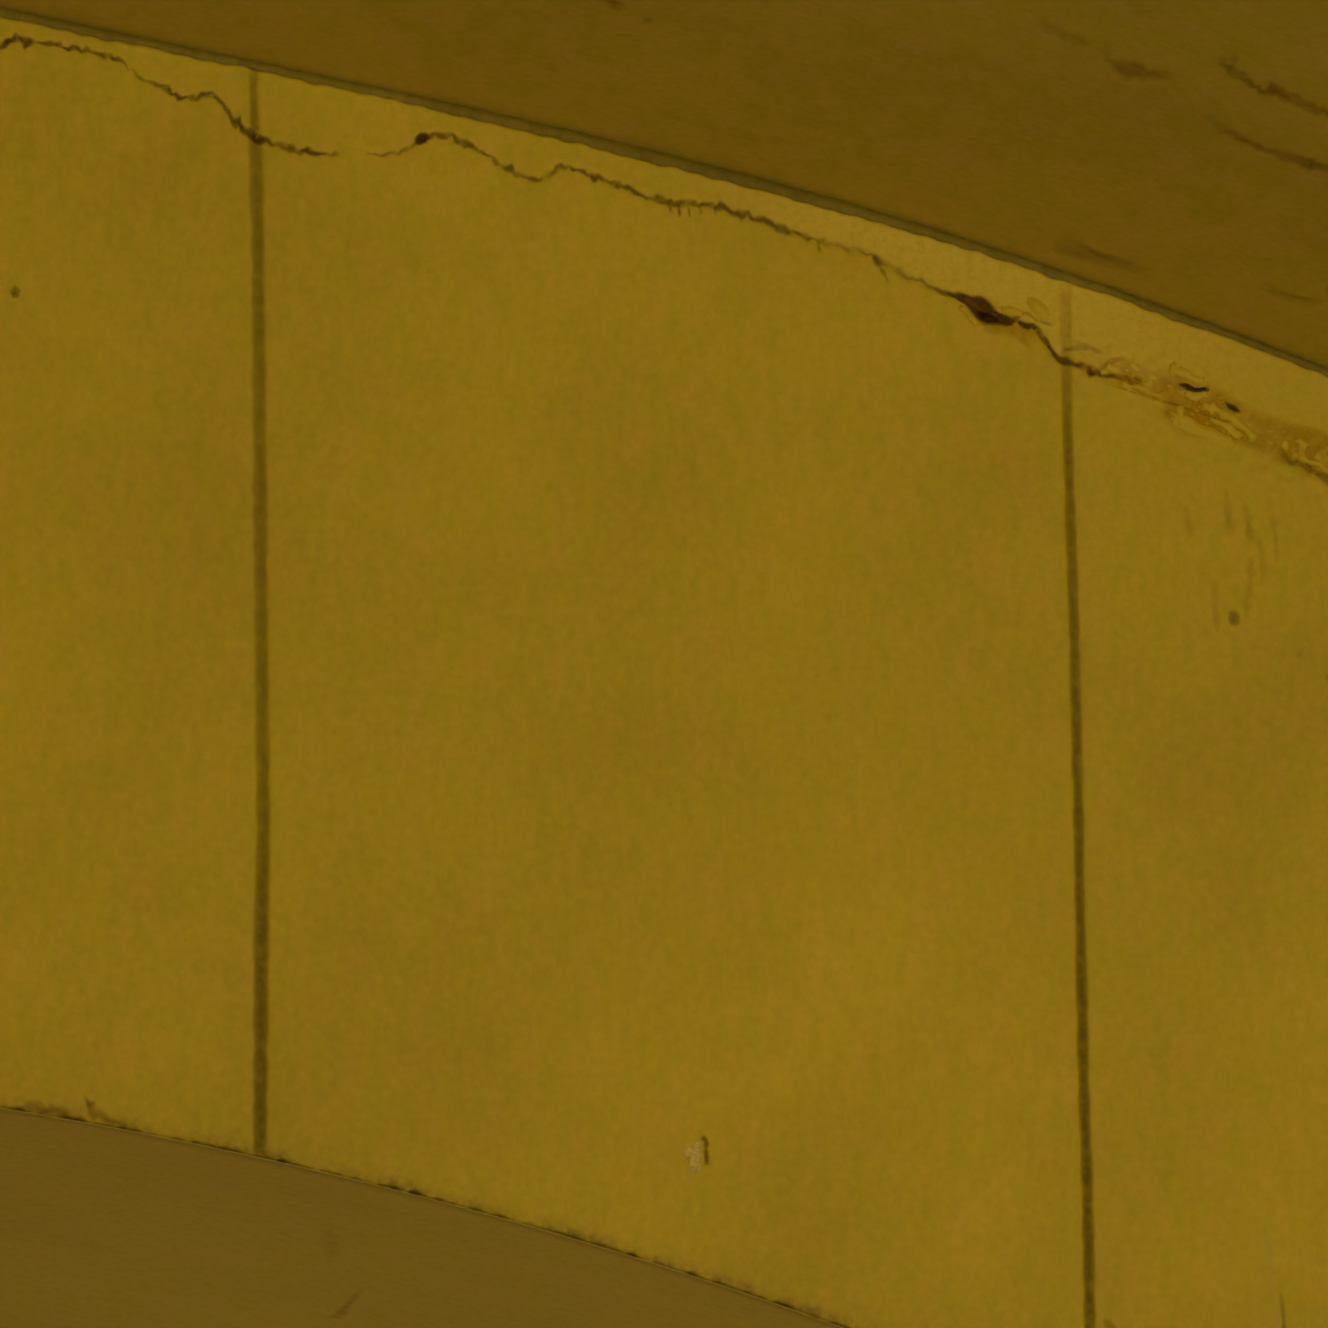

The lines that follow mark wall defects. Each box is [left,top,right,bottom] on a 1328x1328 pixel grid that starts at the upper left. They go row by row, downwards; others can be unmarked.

crack [0,34,119,60]
crack [157,85,324,156]
crack [429,134,800,235]
crack [1002,317,1121,379]
peeling [1169,362,1258,443]